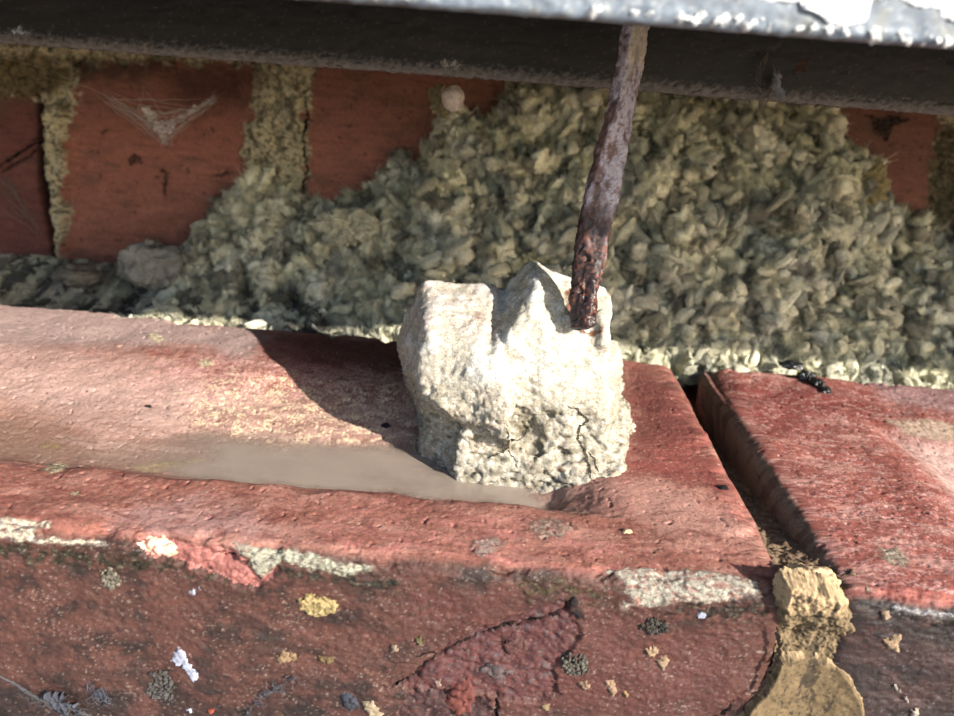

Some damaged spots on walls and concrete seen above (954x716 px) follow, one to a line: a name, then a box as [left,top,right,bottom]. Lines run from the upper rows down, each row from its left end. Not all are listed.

peeling [765,0,872,27]
peeling [901,0,954,21]
crack [488,428,527,468]
crack [568,406,599,480]
spalling [136,535,281,587]
crack [387,599,571,687]